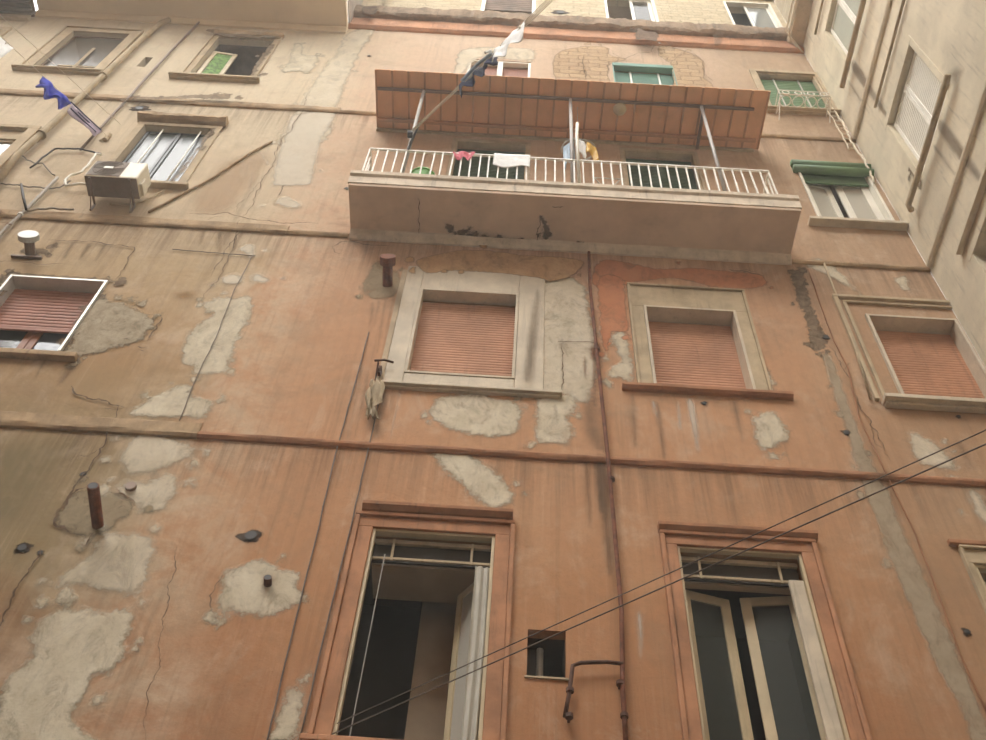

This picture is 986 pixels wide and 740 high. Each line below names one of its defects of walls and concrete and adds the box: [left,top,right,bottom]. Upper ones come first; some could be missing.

flaking render [272,29,372,185]
flaking render [553,42,625,82]
flaking render [658,42,713,87]
crack [191,96,322,297]
flaking render [130,275,253,418]
flaking render [400,224,633,449]
crack [53,386,124,545]
flaking render [100,435,211,512]
flaking render [433,453,518,508]
crack [0,549,41,626]
flaking render [0,525,160,740]
flaking render [204,555,307,625]